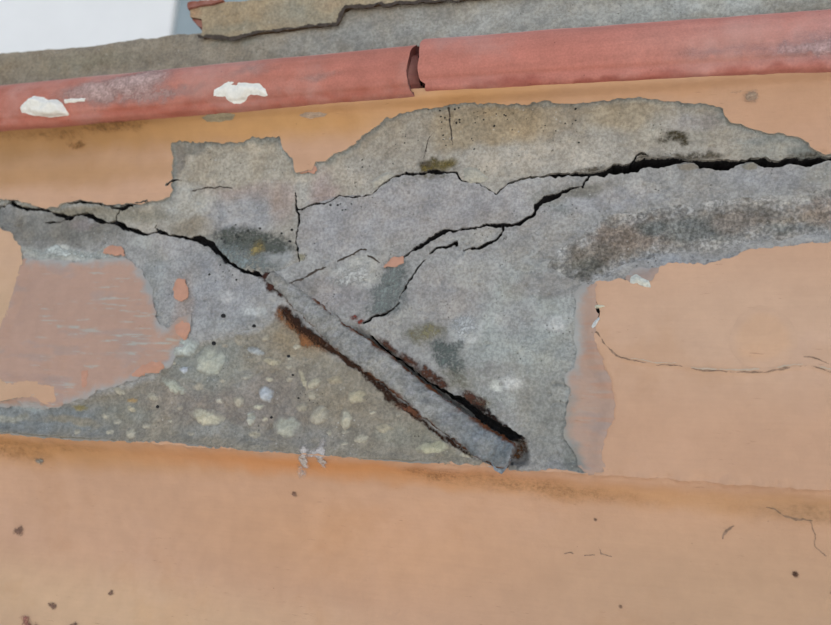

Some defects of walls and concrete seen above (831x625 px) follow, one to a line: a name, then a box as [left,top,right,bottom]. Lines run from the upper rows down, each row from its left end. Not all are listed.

crack [446,107,454,145]
crack [166,179,232,191]
crack [2,200,262,277]
spalling [0,96,831,476]
crack [290,137,831,440]
corrosion [262,272,471,456]
corrosion [458,390,508,433]
corrosion [512,436,527,459]
crack [766,507,826,556]